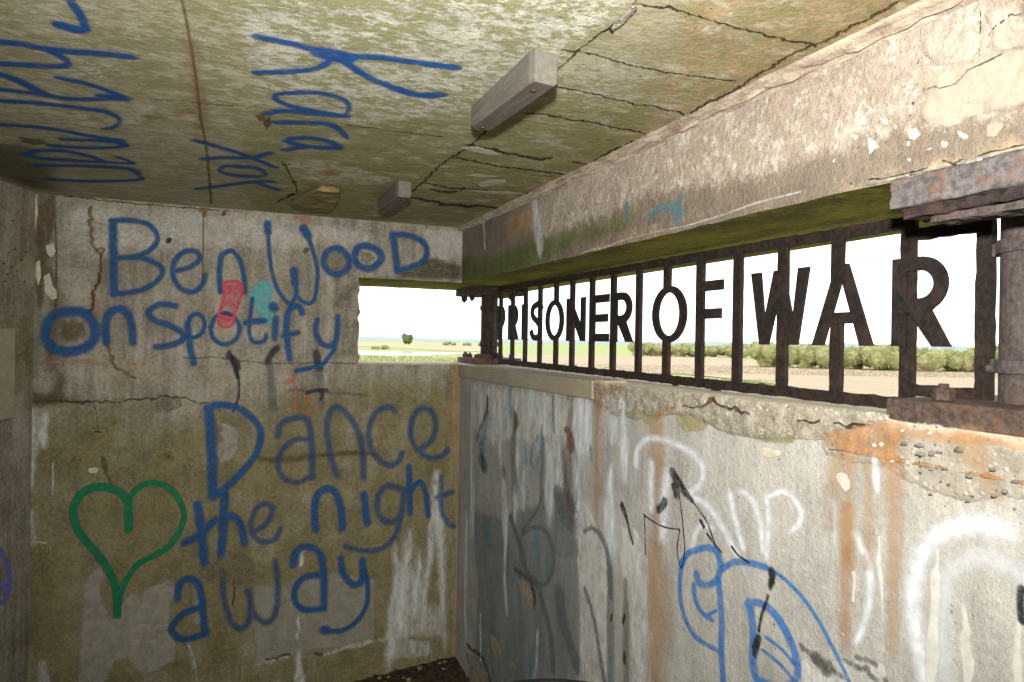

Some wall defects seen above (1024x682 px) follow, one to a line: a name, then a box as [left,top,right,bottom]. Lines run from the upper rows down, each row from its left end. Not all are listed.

crack [348,0,899,209]
spalling [853,116,1024,185]
crack [37,193,243,313]
crack [32,345,215,433]
spalling [593,382,1024,510]
rust [825,423,902,475]
water stain [314,472,445,665]